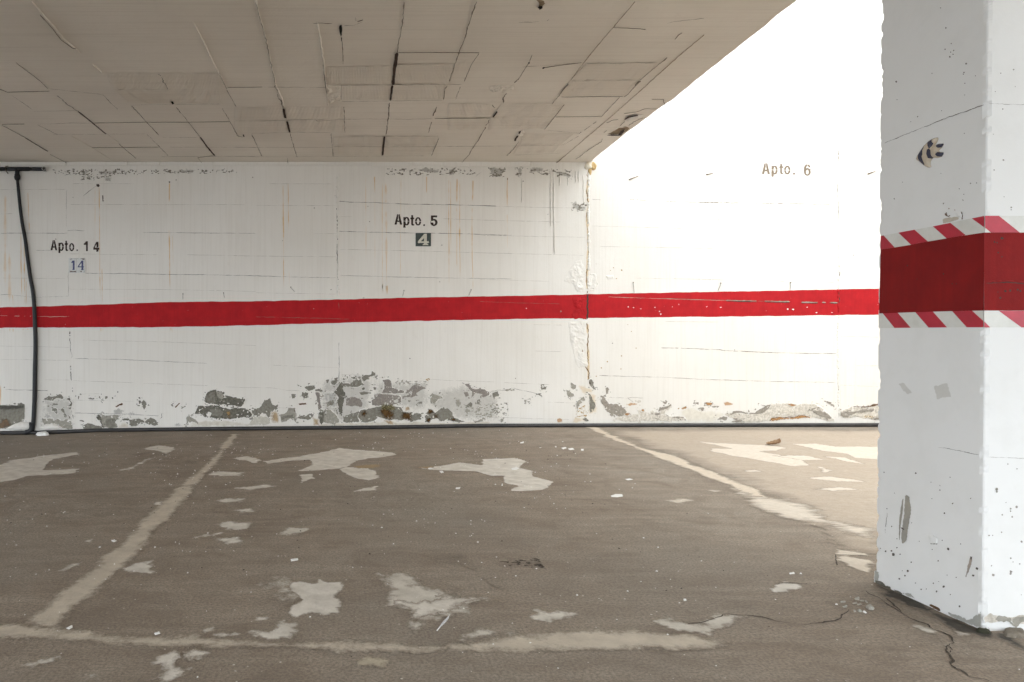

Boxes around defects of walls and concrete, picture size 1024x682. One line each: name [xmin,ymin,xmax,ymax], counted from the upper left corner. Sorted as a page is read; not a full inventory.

crack [382,1,704,380]
peeling [0,391,159,431]
spalling [171,368,547,427]
spalling [557,376,879,423]
crack [688,591,992,682]